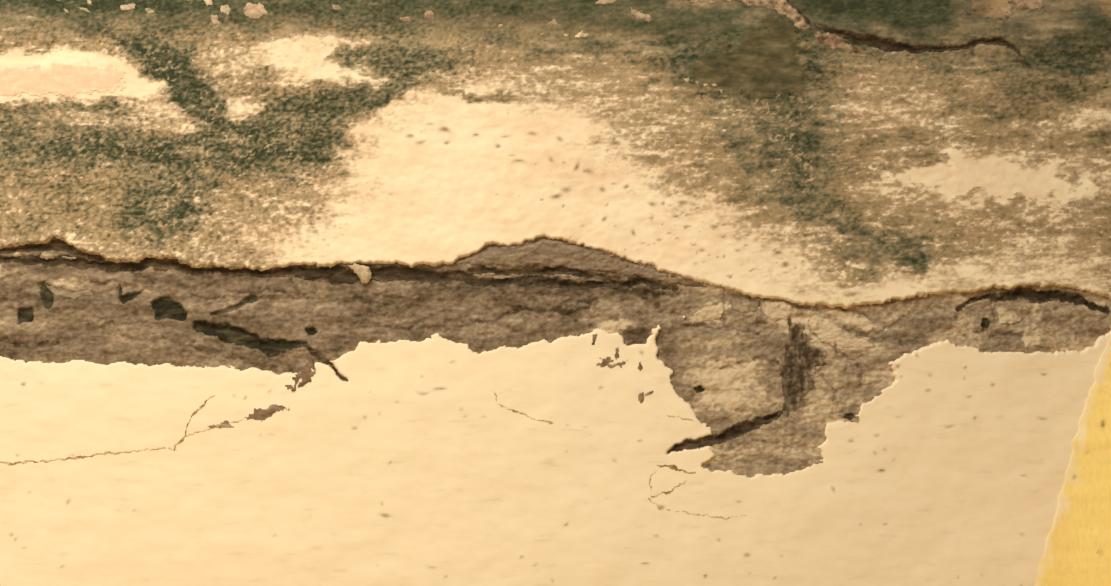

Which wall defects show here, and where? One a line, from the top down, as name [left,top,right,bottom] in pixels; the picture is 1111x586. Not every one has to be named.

water stain [0,0,1111,294]
crack [816,23,1033,68]
spalling [0,236,1111,478]
crack [956,288,1109,314]